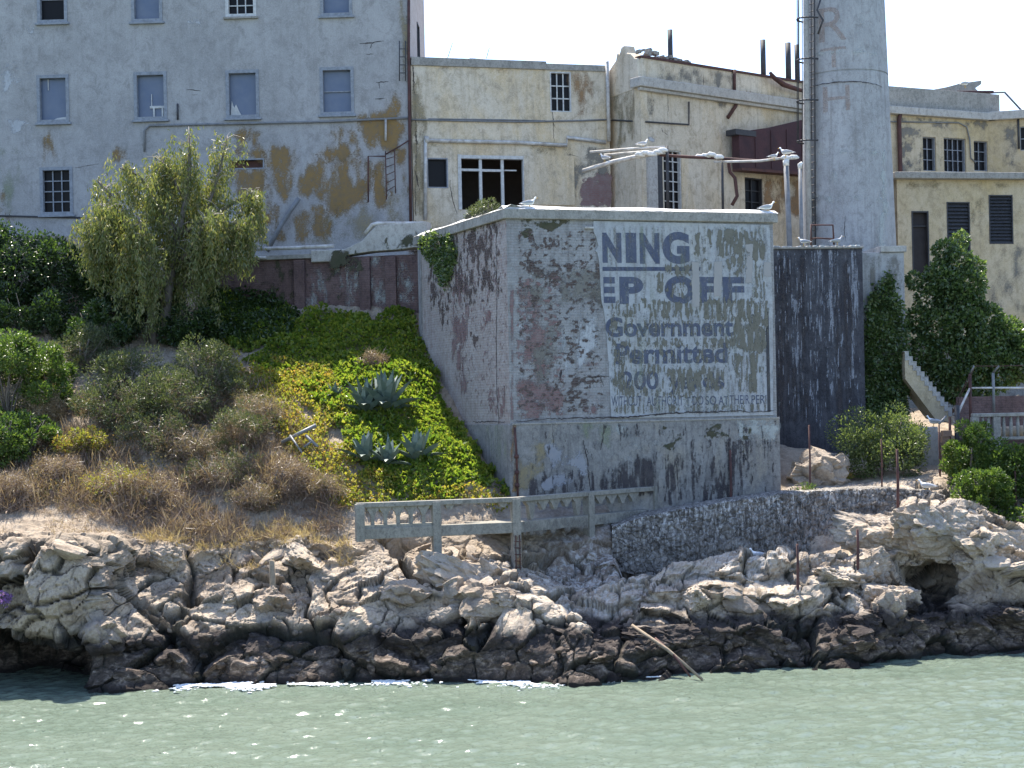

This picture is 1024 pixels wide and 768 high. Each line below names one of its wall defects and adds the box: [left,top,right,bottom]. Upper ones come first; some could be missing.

spalling [574,148,613,207]
peeling [428,210,769,419]
damp [516,250,875,505]